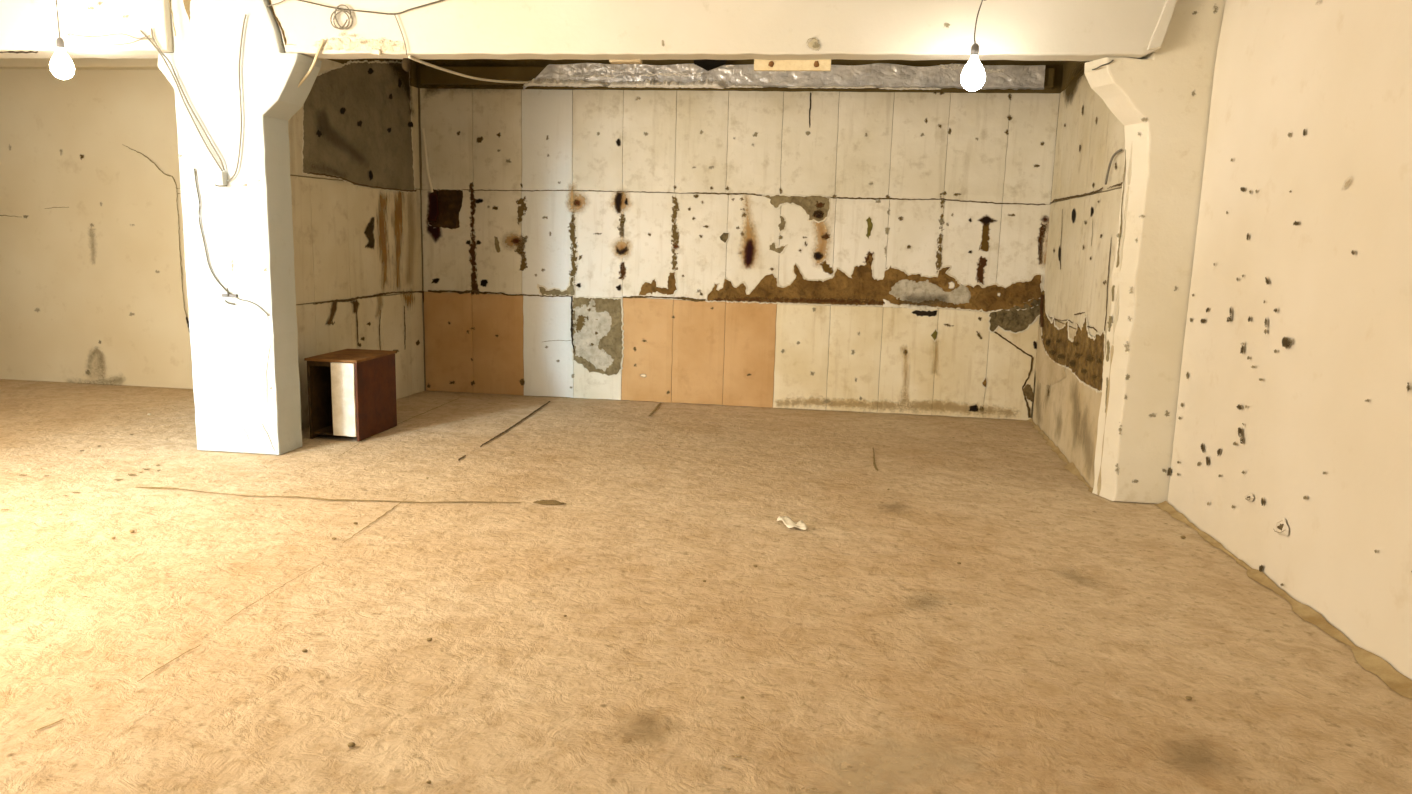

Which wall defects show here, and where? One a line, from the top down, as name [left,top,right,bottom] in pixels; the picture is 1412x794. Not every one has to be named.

flaking render [301,33,465,242]
crack [122,144,190,333]
corrosion [377,189,404,289]
corrosion [466,183,488,295]
corrosion [570,187,585,210]
spalling [493,187,746,377]
corrosion [614,192,628,213]
corrosion [615,240,628,255]
corrosion [742,202,757,267]
corrosion [814,213,834,274]
spalling [697,183,1106,393]
corrosion [968,215,996,284]